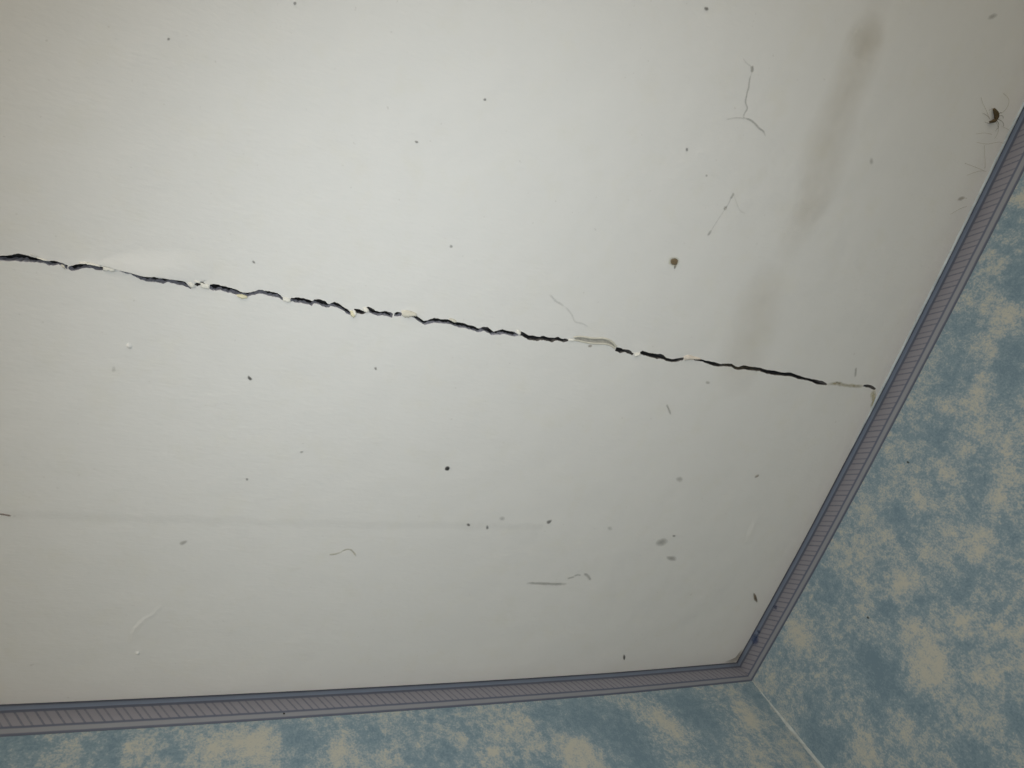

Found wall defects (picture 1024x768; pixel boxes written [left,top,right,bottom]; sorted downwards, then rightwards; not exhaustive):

crack [0,254,876,404]